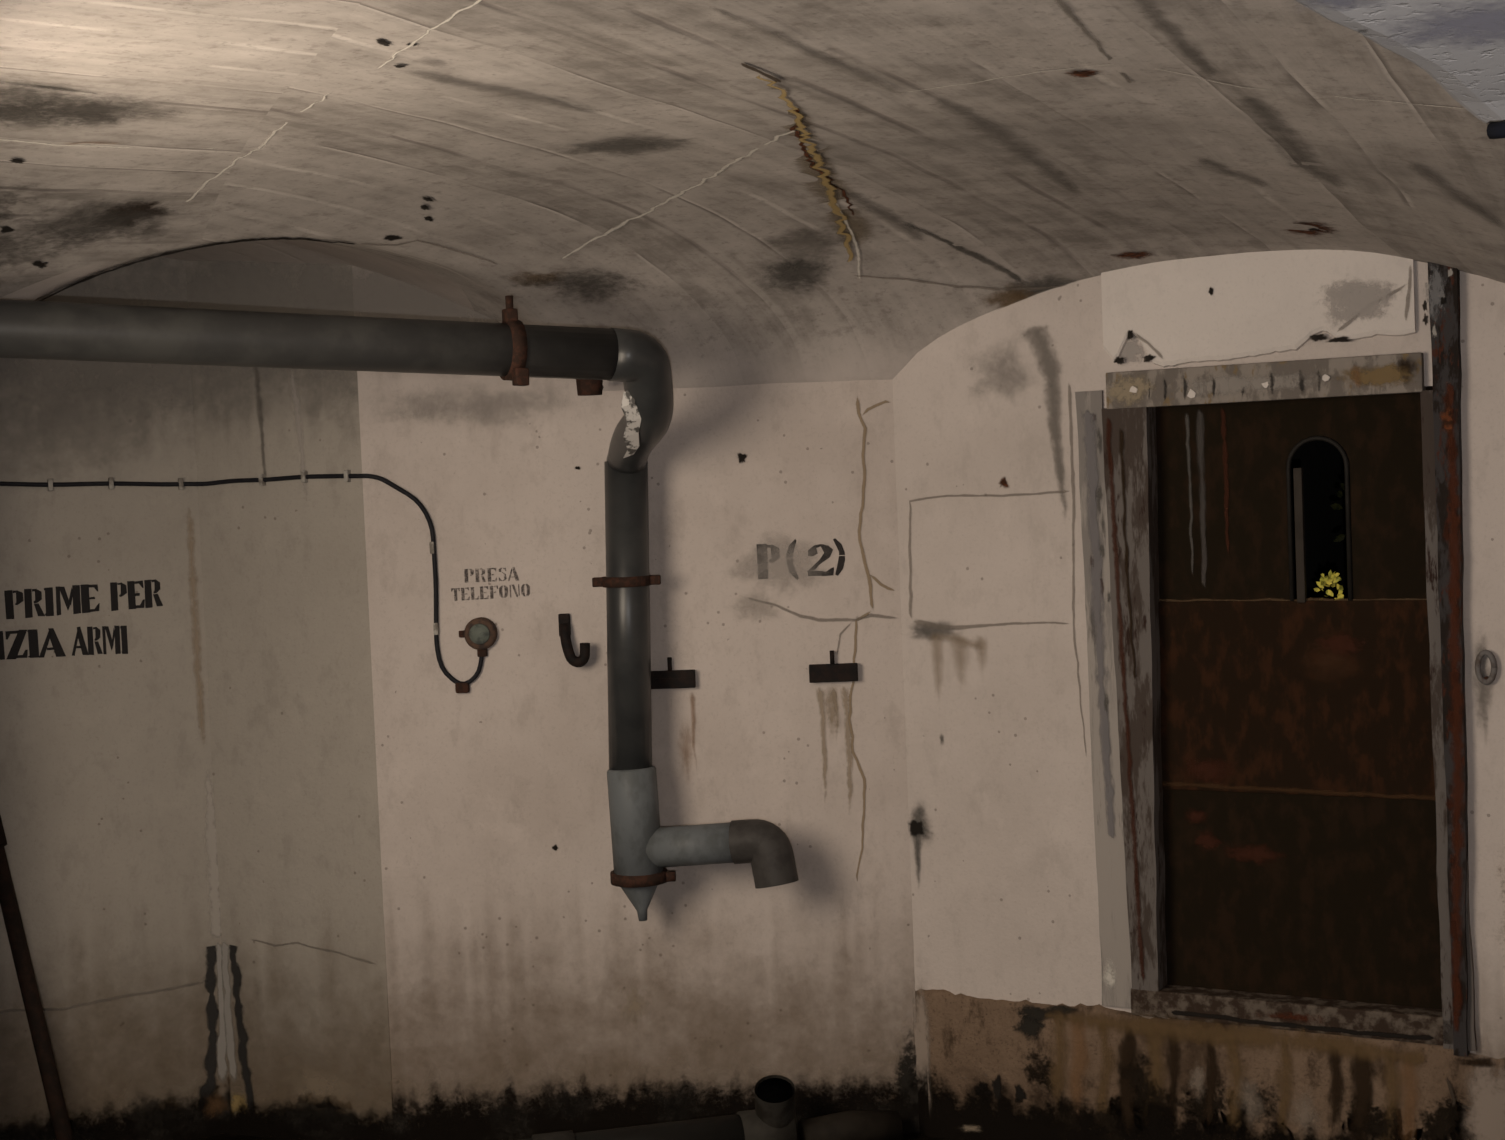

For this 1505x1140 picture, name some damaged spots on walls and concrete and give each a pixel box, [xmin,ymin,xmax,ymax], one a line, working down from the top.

water stain [0,82,136,124]
water stain [41,202,163,241]
crack [562,63,1066,290]
rust [1108,376,1150,405]
rust [1345,360,1414,386]
crack [749,386,1086,878]
rust [1106,419,1145,979]
rust [1162,384,1465,1031]
water stain [0,777,1401,1140]
rust [1047,1010,1434,1140]
water stain [1420,1098,1477,1140]